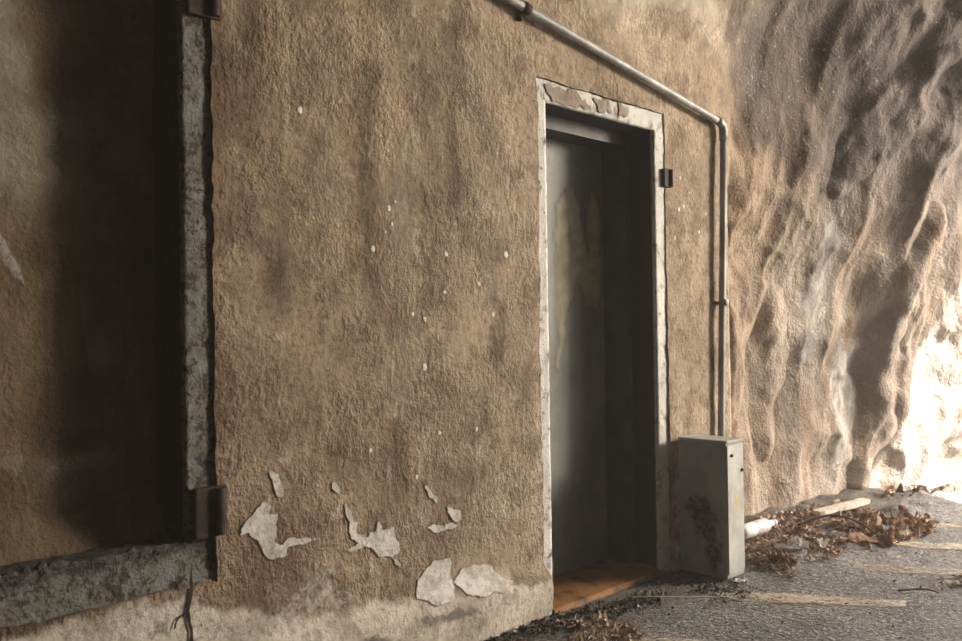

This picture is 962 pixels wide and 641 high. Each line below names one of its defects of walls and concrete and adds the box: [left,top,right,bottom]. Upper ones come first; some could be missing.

peeling [240,471,318,560]
peeling [332,482,406,572]
peeling [425,485,462,533]
crack [174,564,194,641]
peeling [416,557,513,606]